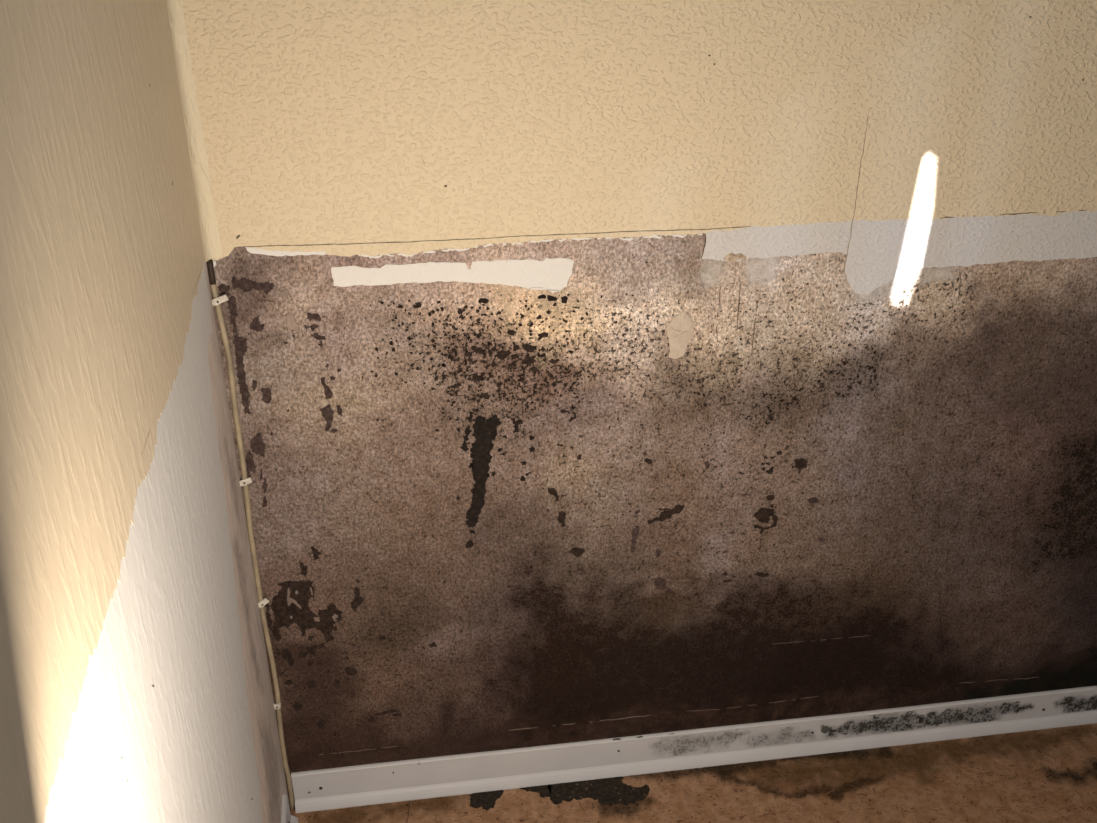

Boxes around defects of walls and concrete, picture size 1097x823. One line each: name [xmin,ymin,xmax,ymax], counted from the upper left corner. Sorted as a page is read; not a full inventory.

leakage [218,272,275,414]
leakage [245,432,274,508]
peeling [204,233,1097,823]
leakage [265,277,1097,775]
leakage [314,807,366,823]
leakage [380,797,451,813]
leakage [469,790,504,811]
leakage [520,728,1087,816]
leakage [1045,761,1097,784]